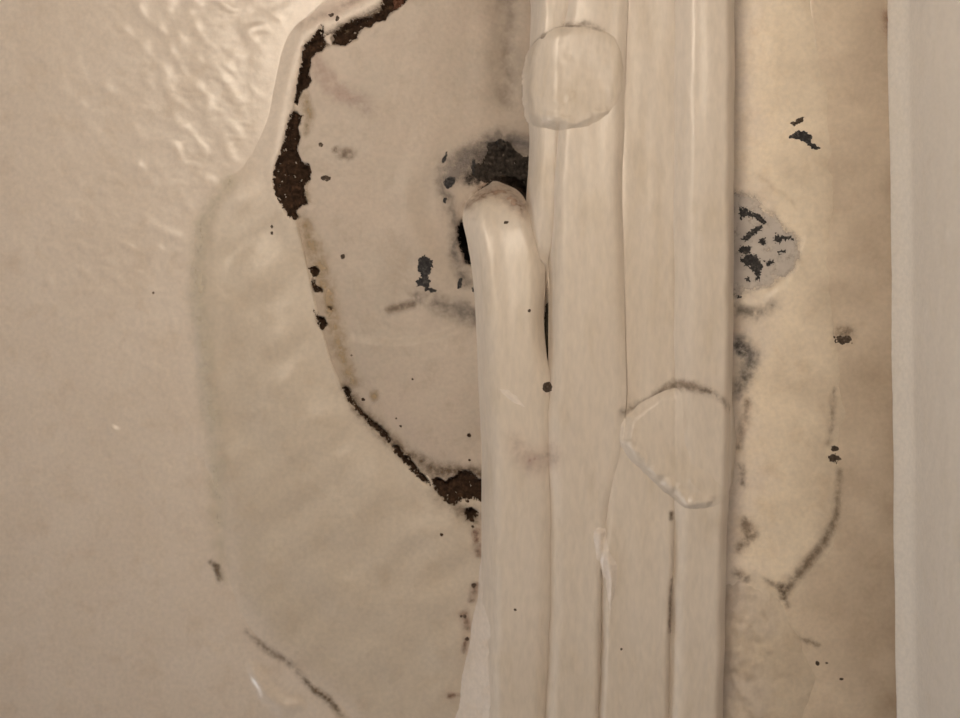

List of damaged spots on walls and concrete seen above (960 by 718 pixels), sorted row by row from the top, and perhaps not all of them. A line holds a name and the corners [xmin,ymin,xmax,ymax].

flaking render [294,0,531,486]
damp [442,139,519,204]
peeling [726,0,852,605]